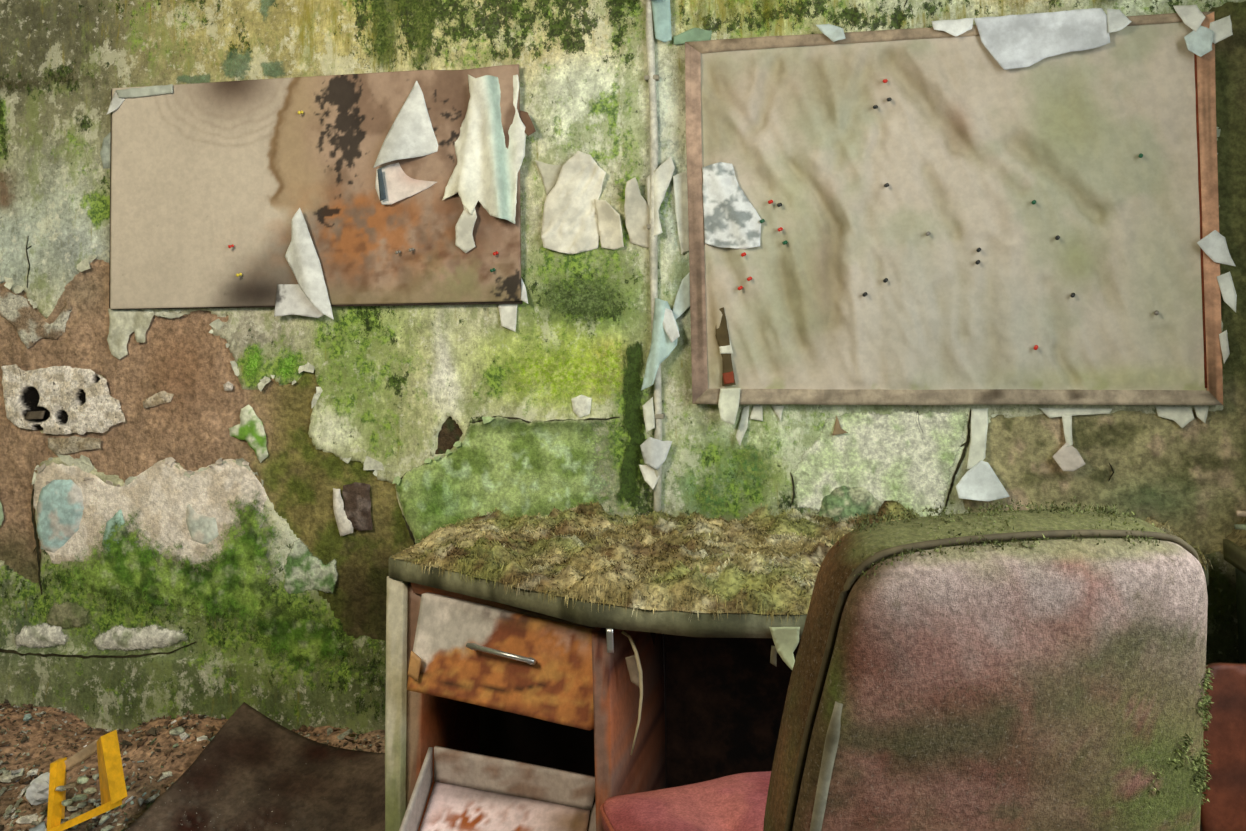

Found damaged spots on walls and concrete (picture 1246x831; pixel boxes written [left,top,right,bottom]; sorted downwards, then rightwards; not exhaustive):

leakage [260,0,274,20]
leakage [369,0,437,70]
leakage [177,49,285,84]
spalling [956,1,1246,555]
peeling [571,395,591,418]
spalling [0,255,414,641]
spalling [430,412,463,457]